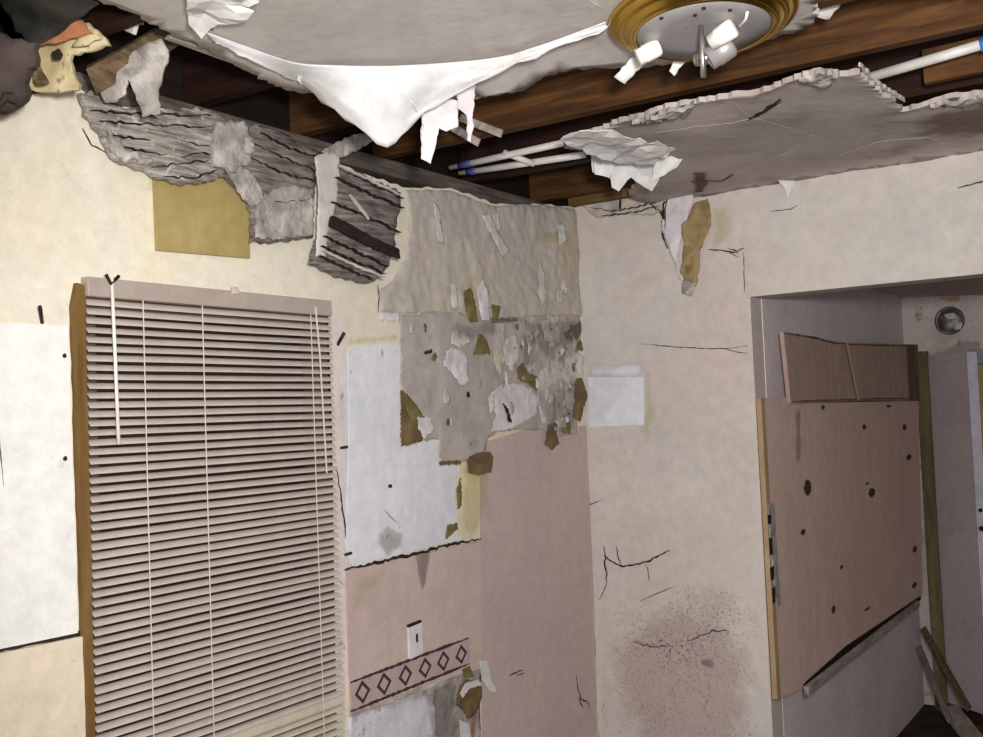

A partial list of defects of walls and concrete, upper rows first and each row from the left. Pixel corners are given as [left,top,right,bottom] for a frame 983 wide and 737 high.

spalling [799,67,838,88]
spalling [77,90,317,244]
peeling [443,331,471,386]
peeling [488,316,645,436]
crack [599,546,675,602]
spalling [347,661,497,737]